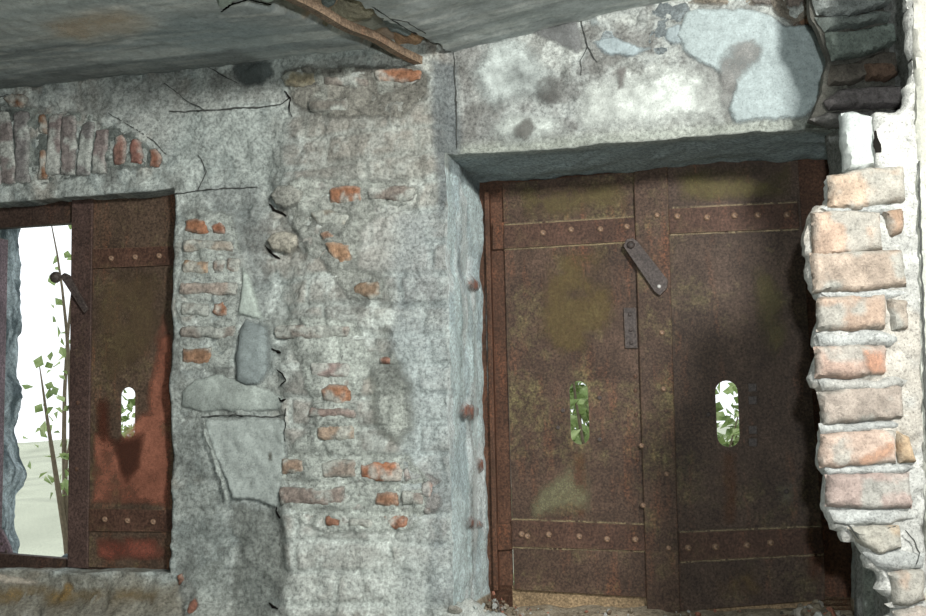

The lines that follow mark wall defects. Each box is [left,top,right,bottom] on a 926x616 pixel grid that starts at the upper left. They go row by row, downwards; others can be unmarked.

spalling [0,94,162,186]
crack [164,83,292,117]
flaking render [477,39,550,104]
flaking render [495,117,559,141]
water stain [721,41,761,101]
spalling [288,176,419,301]
spalling [175,207,243,372]
spalling [579,0,926,616]
spalling [203,315,441,533]